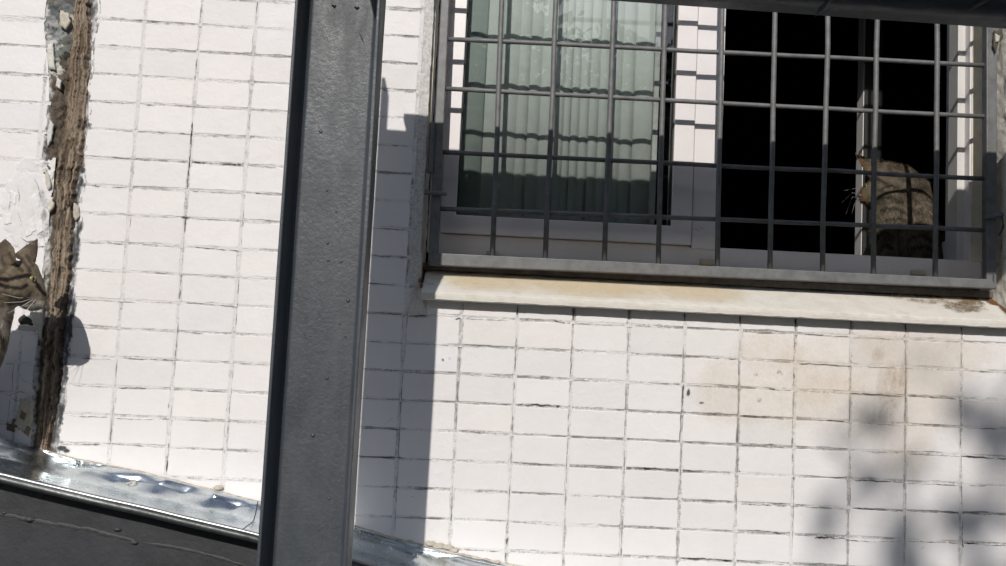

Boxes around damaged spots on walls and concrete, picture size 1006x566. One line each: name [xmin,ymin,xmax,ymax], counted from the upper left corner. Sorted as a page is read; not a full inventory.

peeling [0,0,76,448]
spalling [50,0,101,454]